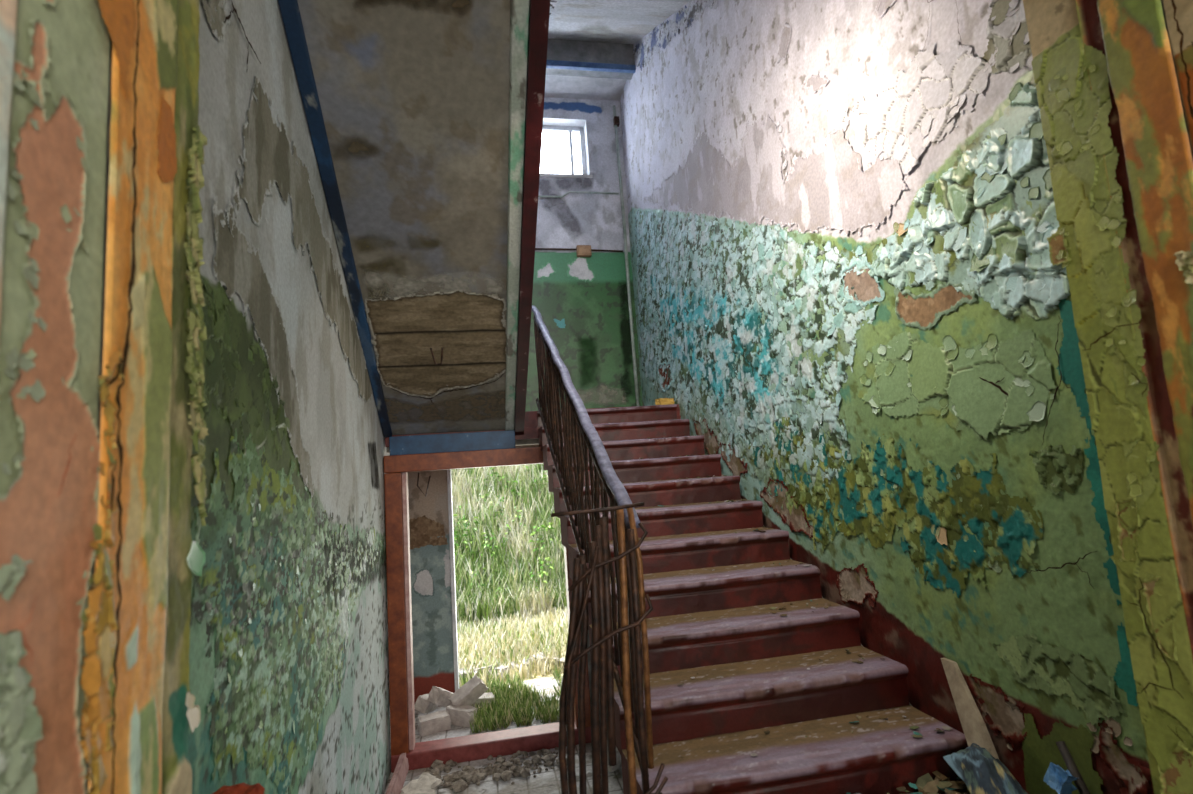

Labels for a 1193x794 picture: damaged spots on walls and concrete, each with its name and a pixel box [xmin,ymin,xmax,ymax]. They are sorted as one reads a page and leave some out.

leakage [356,0,471,14]
crack [1171,0,1193,118]
leakage [337,138,378,156]
peeling [0,18,124,794]
crack [106,0,139,794]
peeling [157,97,385,794]
spalling [364,289,507,398]
peeling [633,0,1160,607]
crack [979,377,1008,396]
peeling [1173,251,1193,289]
crack [1026,551,1097,587]